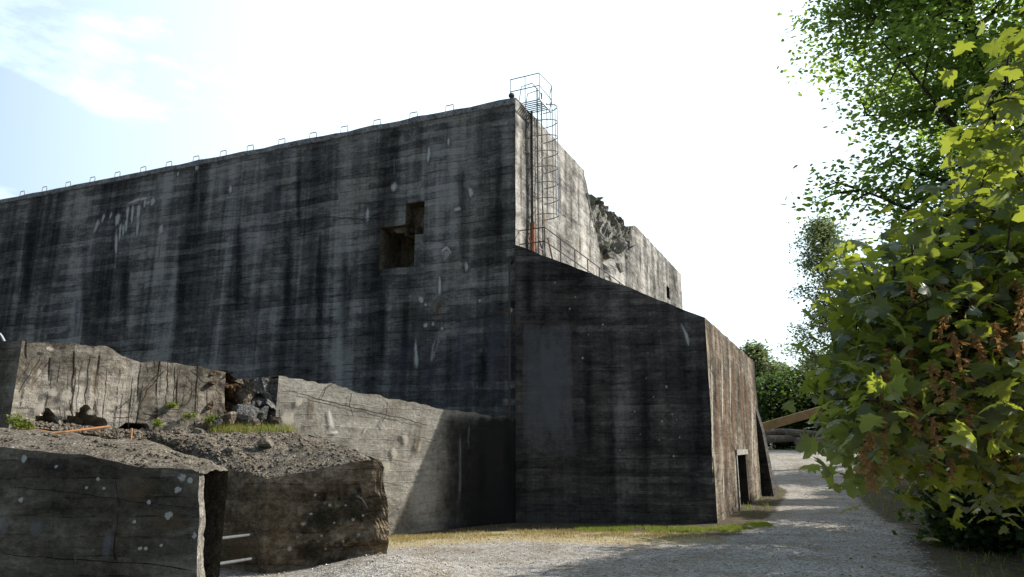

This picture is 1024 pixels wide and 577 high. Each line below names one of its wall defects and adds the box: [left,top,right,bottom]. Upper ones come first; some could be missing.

damp [94,197,155,253]
damp [404,322,443,367]